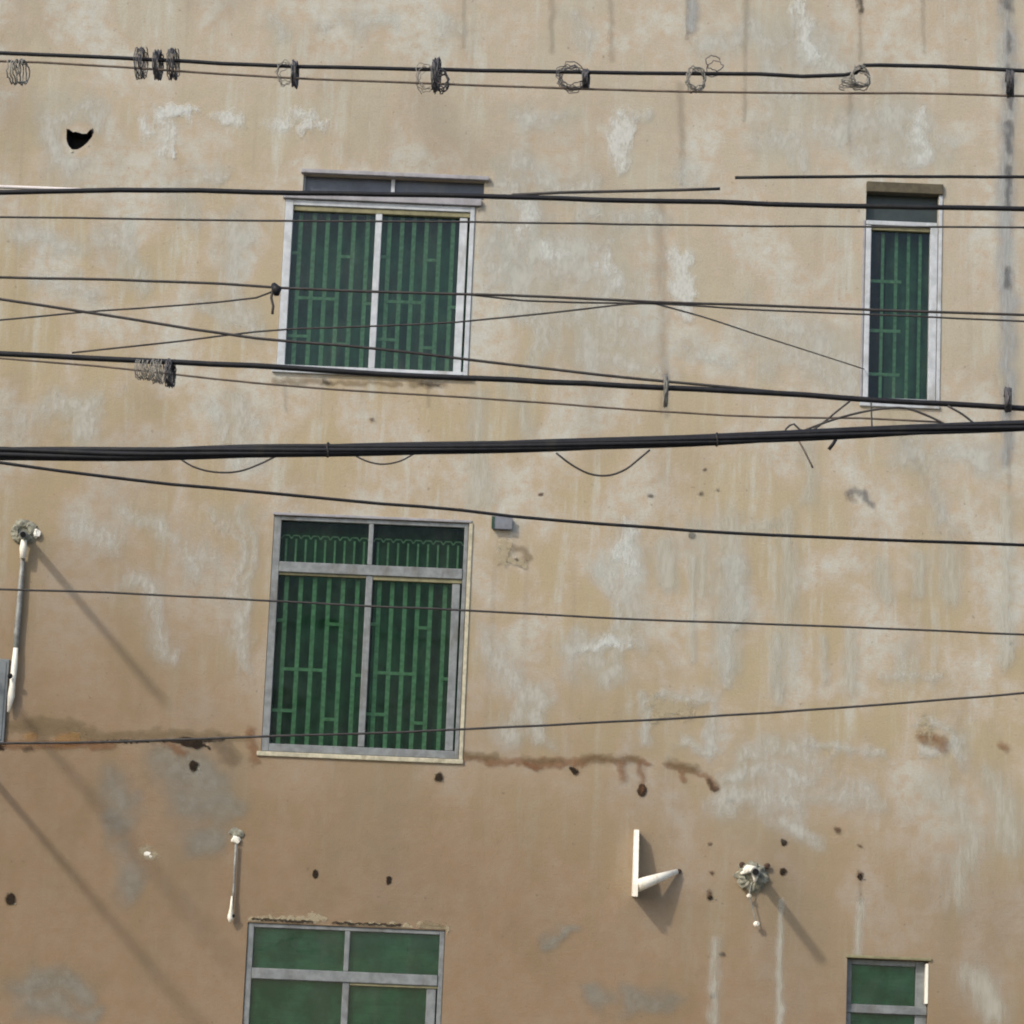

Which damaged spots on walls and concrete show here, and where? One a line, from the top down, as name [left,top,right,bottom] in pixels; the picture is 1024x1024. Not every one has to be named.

peeling [46,101,101,169]
rust [180,737,203,749]
spalling [248,913,449,932]